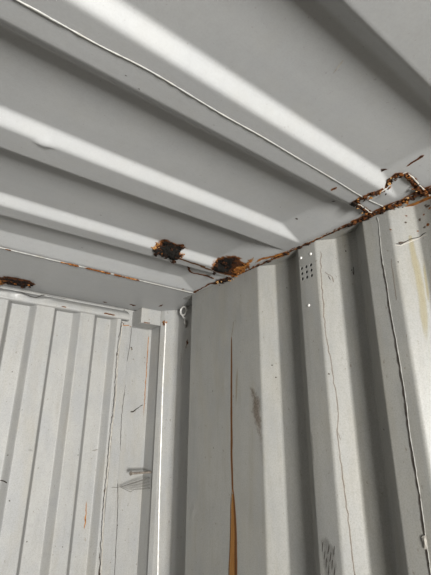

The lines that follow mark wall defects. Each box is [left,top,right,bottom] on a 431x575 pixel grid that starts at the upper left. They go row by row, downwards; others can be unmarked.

rust [0,276,35,288]
rust [151,155,431,293]
rust [229,337,237,575]